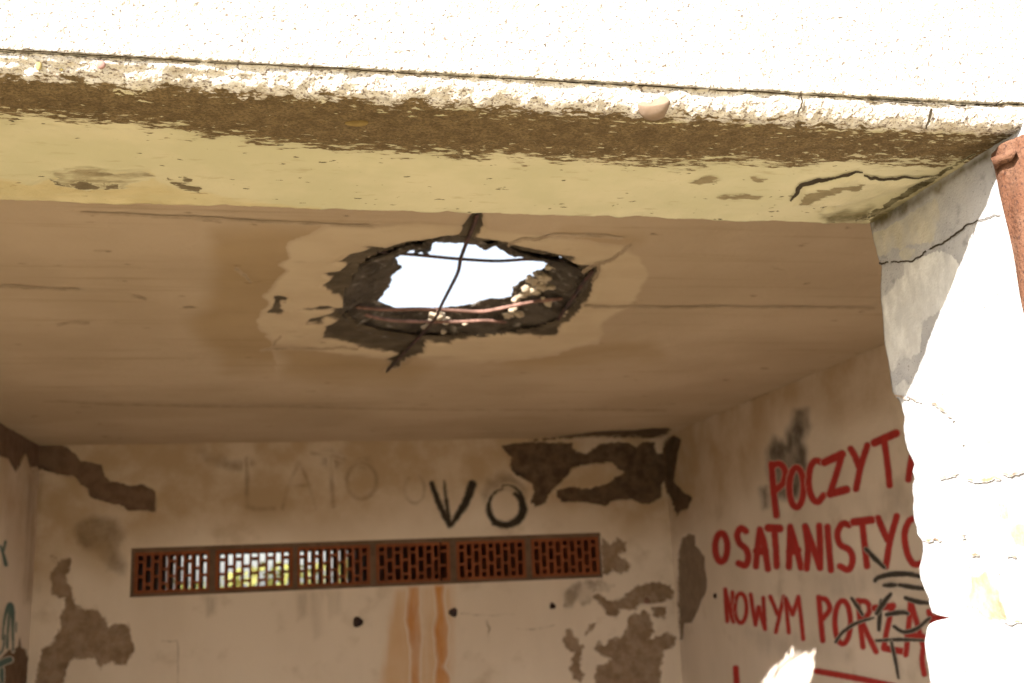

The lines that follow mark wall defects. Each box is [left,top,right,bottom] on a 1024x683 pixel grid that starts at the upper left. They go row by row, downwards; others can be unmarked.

crack [790,153,976,223]
crack [879,214,1001,265]
spalling [302,213,599,372]
spalling [0,423,157,512]
spalling [501,427,693,518]
spalling [0,554,136,683]
rust [377,584,458,683]
spalling [562,533,707,683]